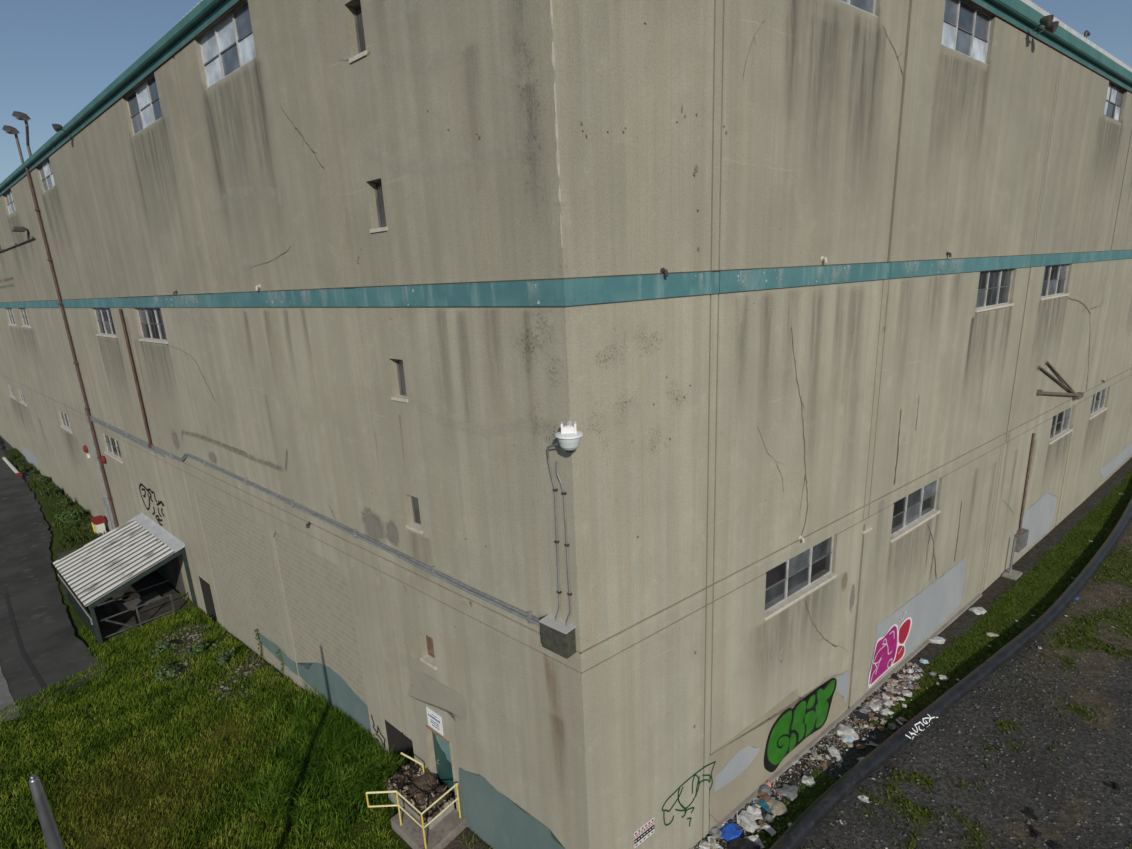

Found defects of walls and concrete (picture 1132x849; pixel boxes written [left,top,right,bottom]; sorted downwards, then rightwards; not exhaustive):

crack [758,327,808,536]